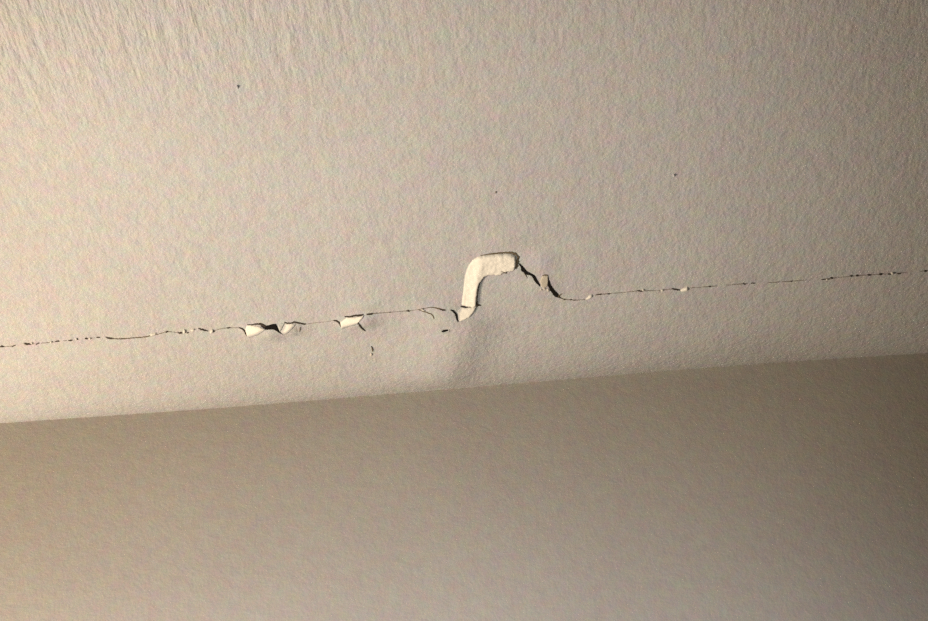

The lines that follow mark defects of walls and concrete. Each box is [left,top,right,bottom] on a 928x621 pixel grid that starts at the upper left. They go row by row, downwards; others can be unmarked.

peeling [428,198,603,327]
crack [519,263,928,301]
crack [0,327,238,347]
peeling [228,284,406,351]
crack [372,295,492,334]